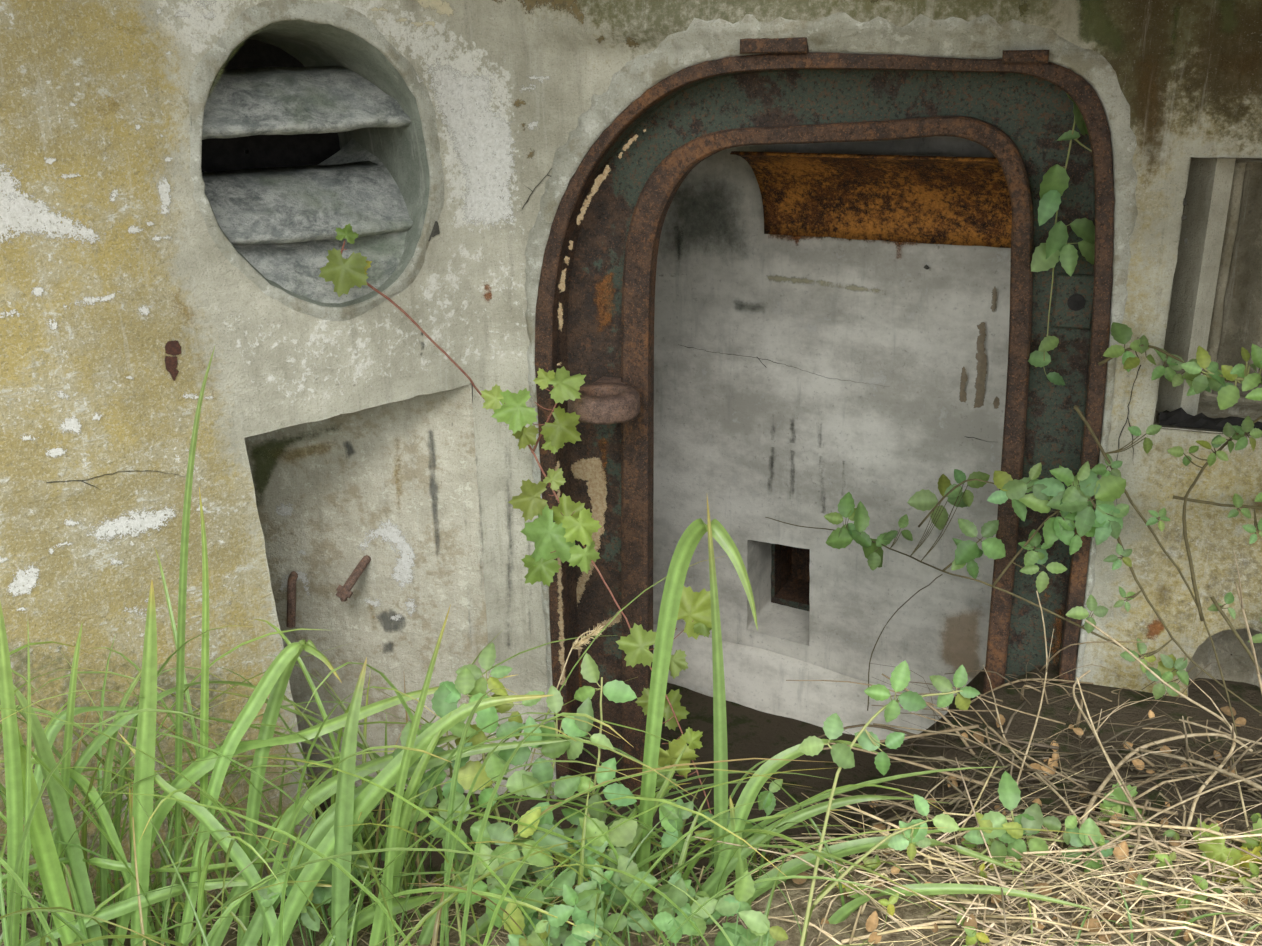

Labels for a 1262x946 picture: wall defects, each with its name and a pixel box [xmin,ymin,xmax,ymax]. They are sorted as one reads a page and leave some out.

peeling [494,0,586,24]
peeling [0,163,105,246]
peeling [576,130,646,225]
peeling [557,240,573,331]
rust [593,272,615,331]
rust [165,340,181,381]
crack [46,470,180,489]